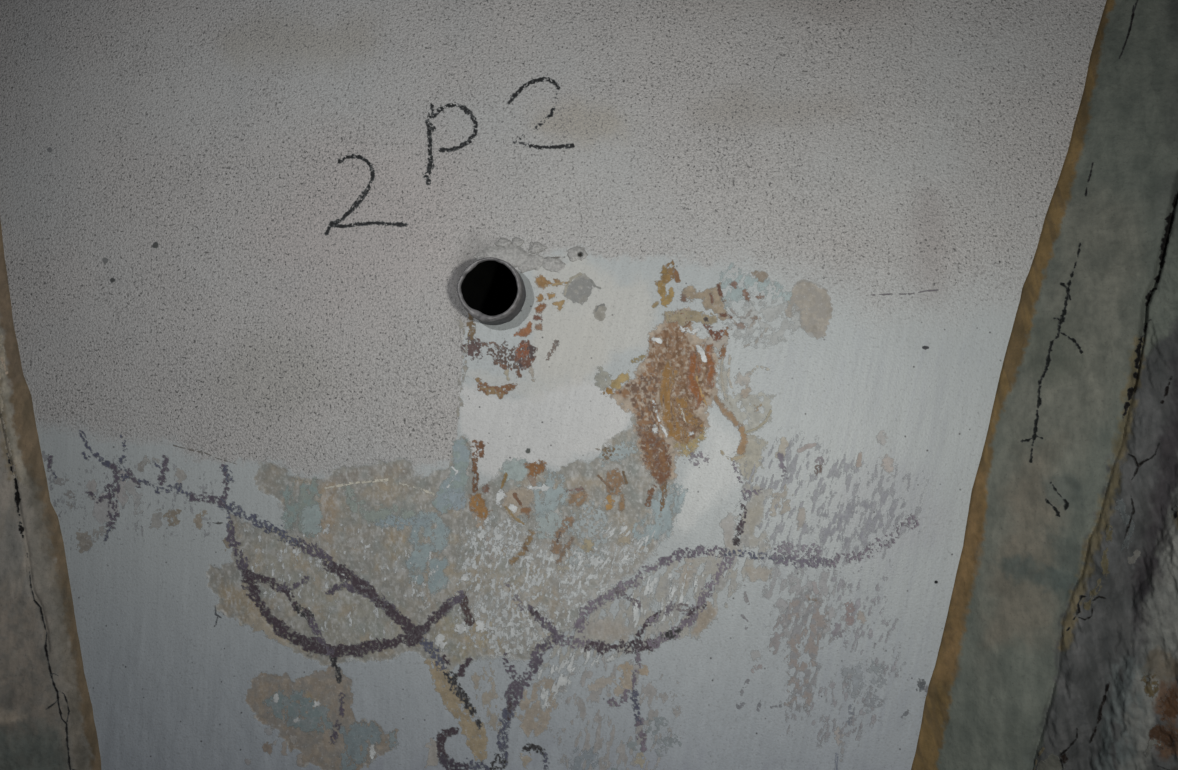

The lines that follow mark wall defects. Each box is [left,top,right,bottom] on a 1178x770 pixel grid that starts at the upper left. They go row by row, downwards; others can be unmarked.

crack [1119,0,1138,59]
corrosion [456,274,569,417]
peeling [562,272,607,321]
corrosion [595,260,732,512]
peeling [751,270,769,283]
peeling [784,279,833,340]
crack [1021,243,1083,517]
crack [1123,192,1178,418]
peeling [42,451,216,553]
crack [6,453,75,770]
peeling [206,414,927,770]
crack [1060,681,1110,770]